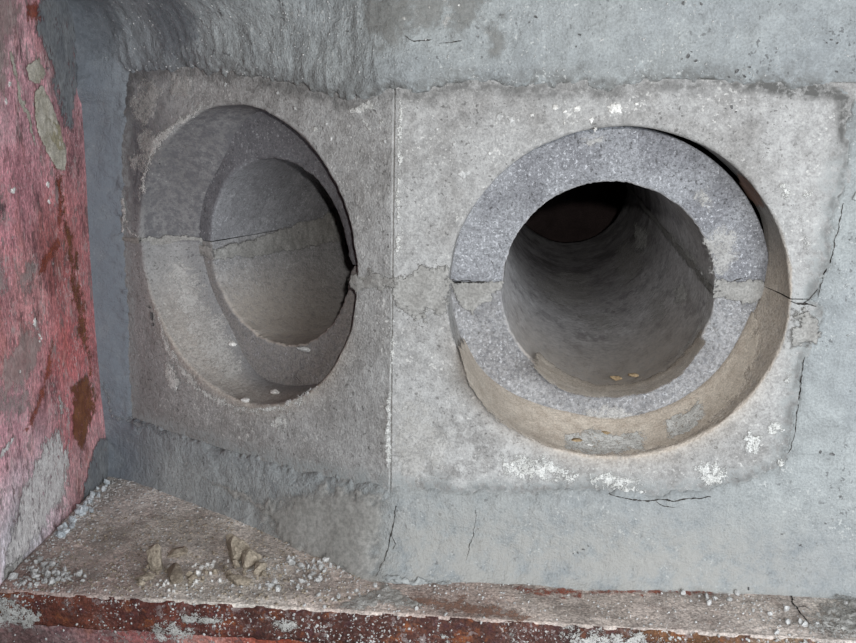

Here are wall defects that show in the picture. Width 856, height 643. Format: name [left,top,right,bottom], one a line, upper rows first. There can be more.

crack [791,203,844,307]
crack [609,493,711,508]
crack [375,506,397,577]